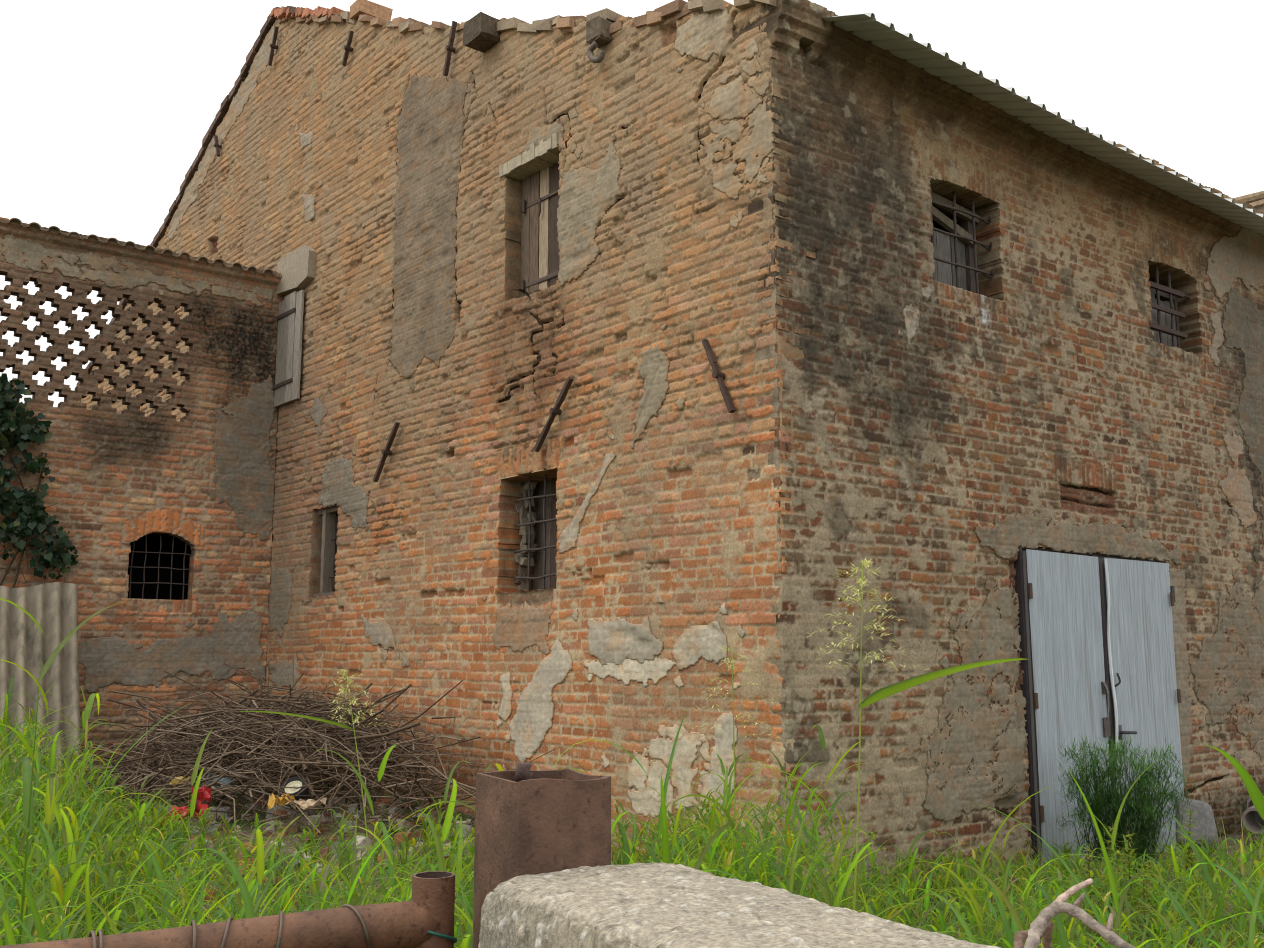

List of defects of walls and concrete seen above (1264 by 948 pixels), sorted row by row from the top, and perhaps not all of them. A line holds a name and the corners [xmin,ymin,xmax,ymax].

peeling [664,4,776,228]
peeling [524,107,623,300]
crack [497,289,565,408]
peeling [630,344,686,448]
peeling [559,433,616,553]
peeling [495,603,746,771]
peeling [627,712,746,832]